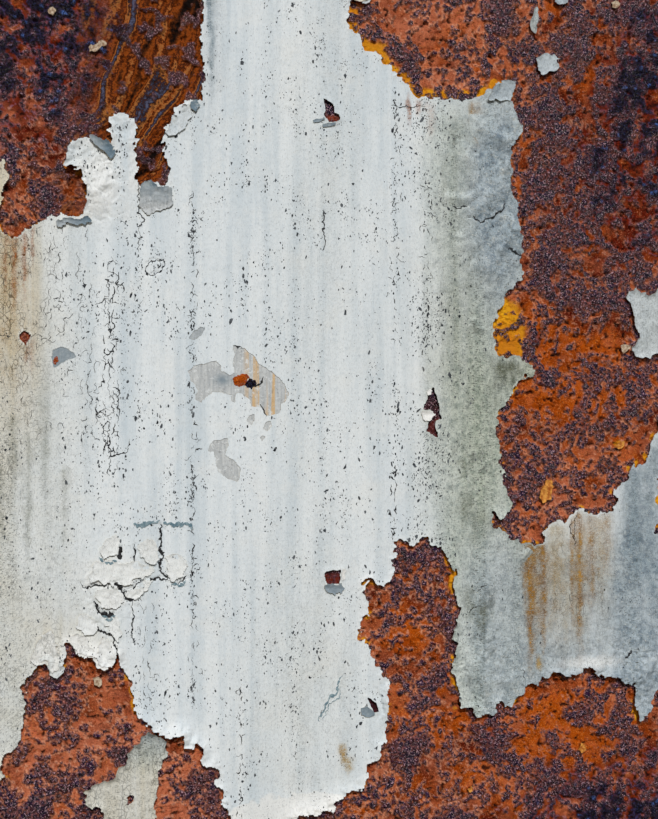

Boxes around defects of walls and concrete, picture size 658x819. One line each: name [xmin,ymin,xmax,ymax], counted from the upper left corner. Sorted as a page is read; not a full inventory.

peeling [0,0,206,239]
peeling [313,99,340,127]
peeling [346,0,658,546]
peeling [19,331,31,345]
peeling [51,347,76,368]
crack [0,225,130,476]
peeling [188,345,289,441]
peeling [208,438,241,482]
rust [526,544,546,650]
rust [570,514,593,606]
peeling [0,630,231,819]
peeling [297,537,658,819]